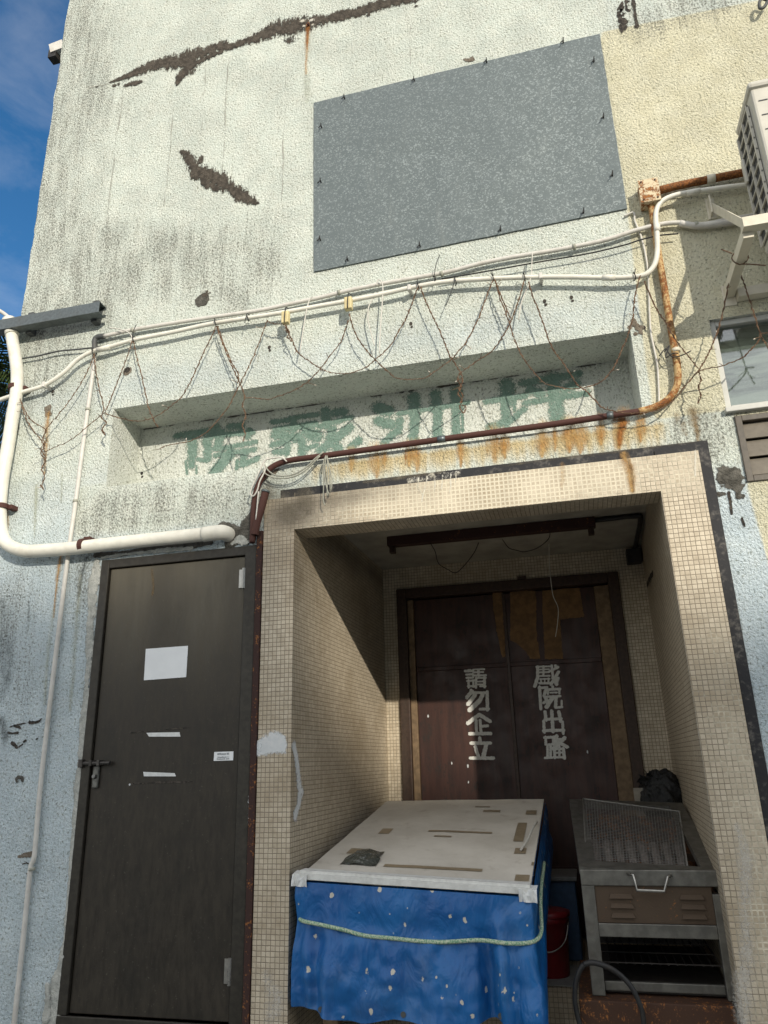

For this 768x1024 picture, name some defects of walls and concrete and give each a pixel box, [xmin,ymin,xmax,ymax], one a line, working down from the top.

peeling [617,0,639,32]
rust [539,410,645,492]
peeling [7,718,42,749]